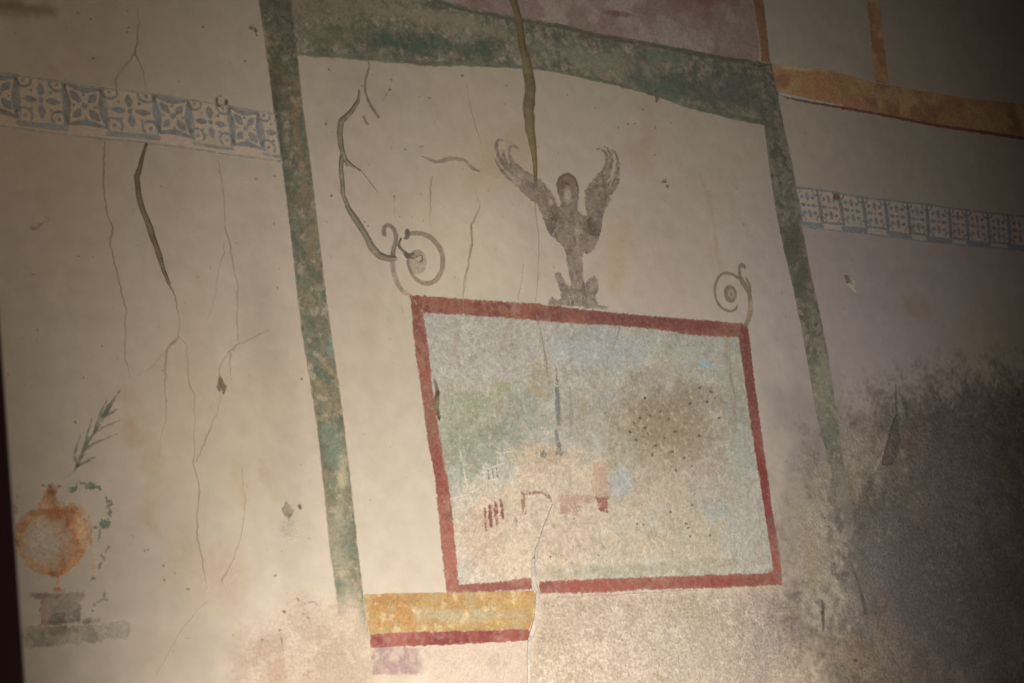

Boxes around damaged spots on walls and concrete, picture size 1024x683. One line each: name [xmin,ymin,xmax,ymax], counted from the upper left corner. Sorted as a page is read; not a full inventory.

crack [103,153,127,319]
crack [134,143,177,302]
crack [337,47,397,262]
crack [423,157,480,206]
crack [464,213,478,282]
crack [509,0,539,232]
crack [527,505,553,683]